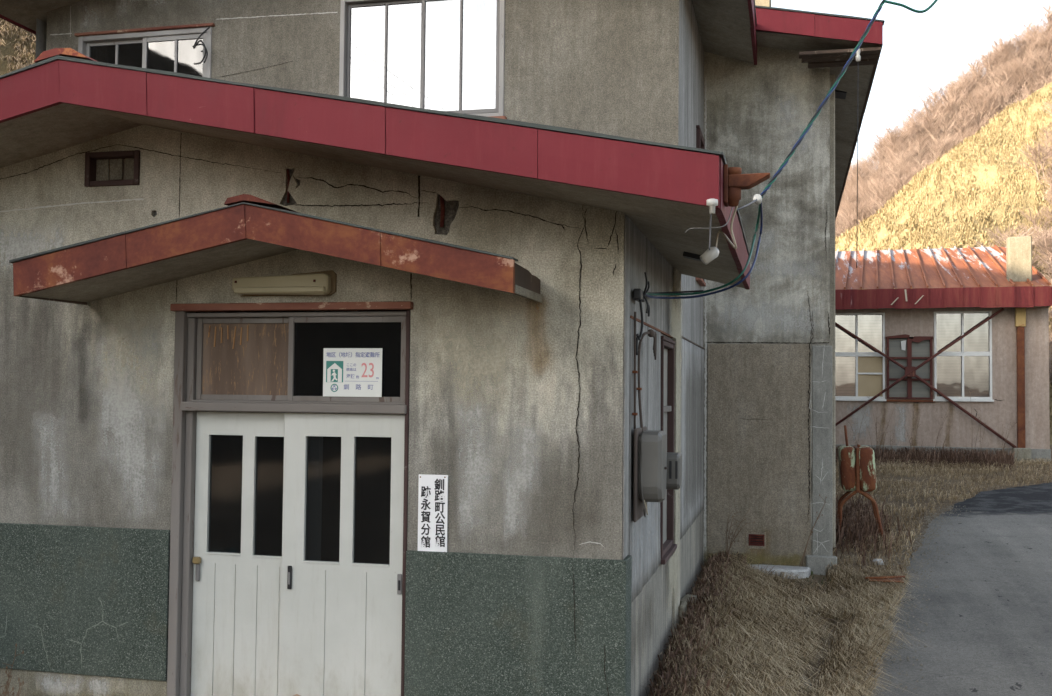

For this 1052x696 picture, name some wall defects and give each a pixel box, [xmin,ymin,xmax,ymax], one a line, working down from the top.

crack [1,144,435,207]
water stain [0,233,62,264]
water stain [101,344,155,510]
water stain [506,429,535,530]
crack [460,206,619,652]